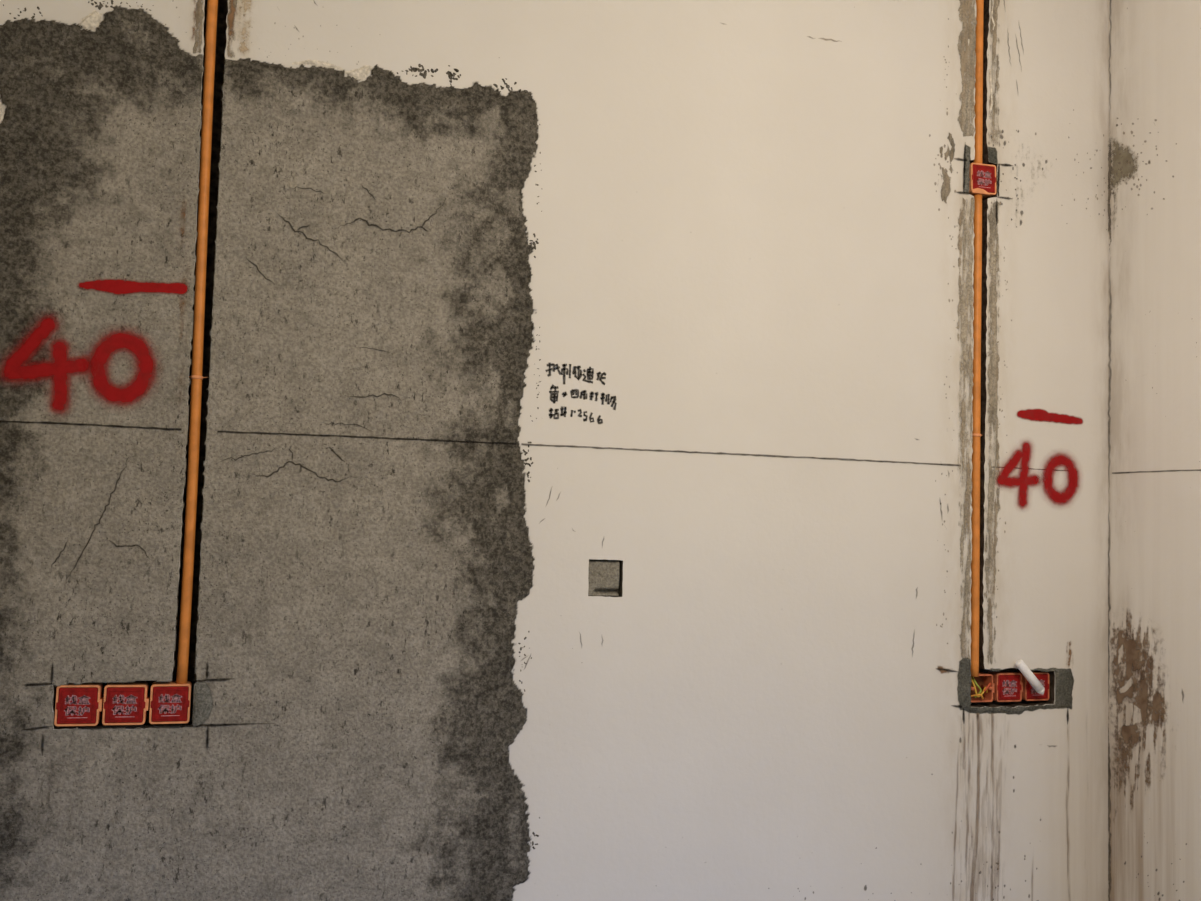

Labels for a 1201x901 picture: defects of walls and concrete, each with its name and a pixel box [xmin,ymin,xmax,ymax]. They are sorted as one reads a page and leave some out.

flaking render [79,10,102,31]
flaking render [292,59,372,80]
crack [279,186,439,258]
crack [225,393,400,482]